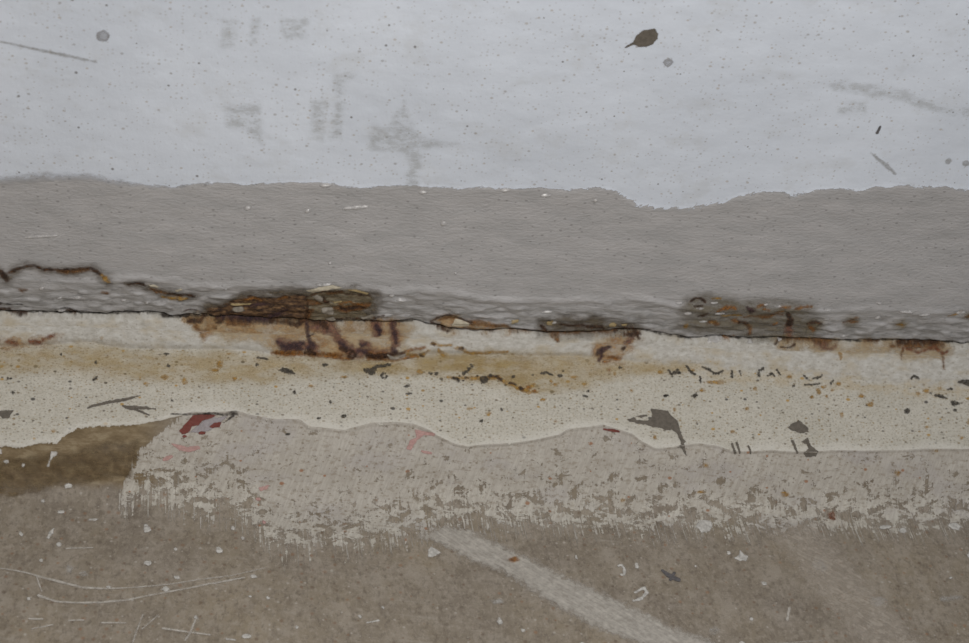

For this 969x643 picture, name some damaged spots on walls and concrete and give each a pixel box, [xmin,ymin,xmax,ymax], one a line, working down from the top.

rust [0,265,110,294]
rust [125,282,491,361]
rust [431,314,650,363]
rust [684,296,951,368]
spalling [363,363,391,379]
spalling [453,364,522,390]
rust [447,375,545,400]
spalling [667,365,742,398]
spalling [930,379,969,411]
peeling [118,409,969,571]